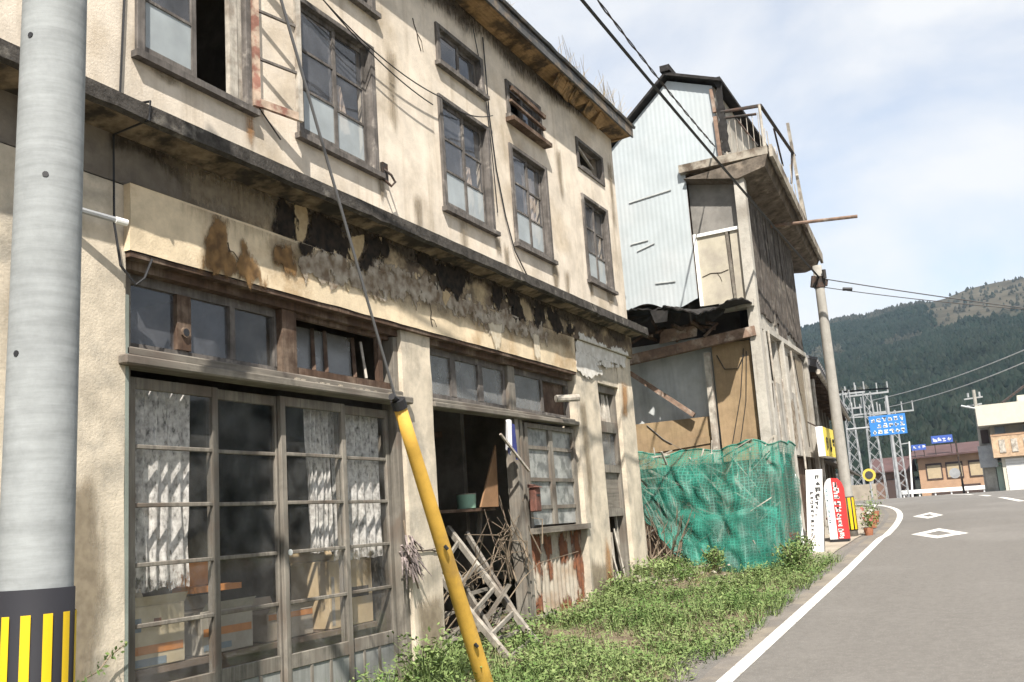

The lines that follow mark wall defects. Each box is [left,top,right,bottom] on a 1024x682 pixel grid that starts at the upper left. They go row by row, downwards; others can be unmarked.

leakage [183,161,291,289]
leakage [274,244,303,277]
spalling [272,198,629,379]
leakage [406,289,570,359]
rust [536,594,544,621]
rust [531,527,585,612]